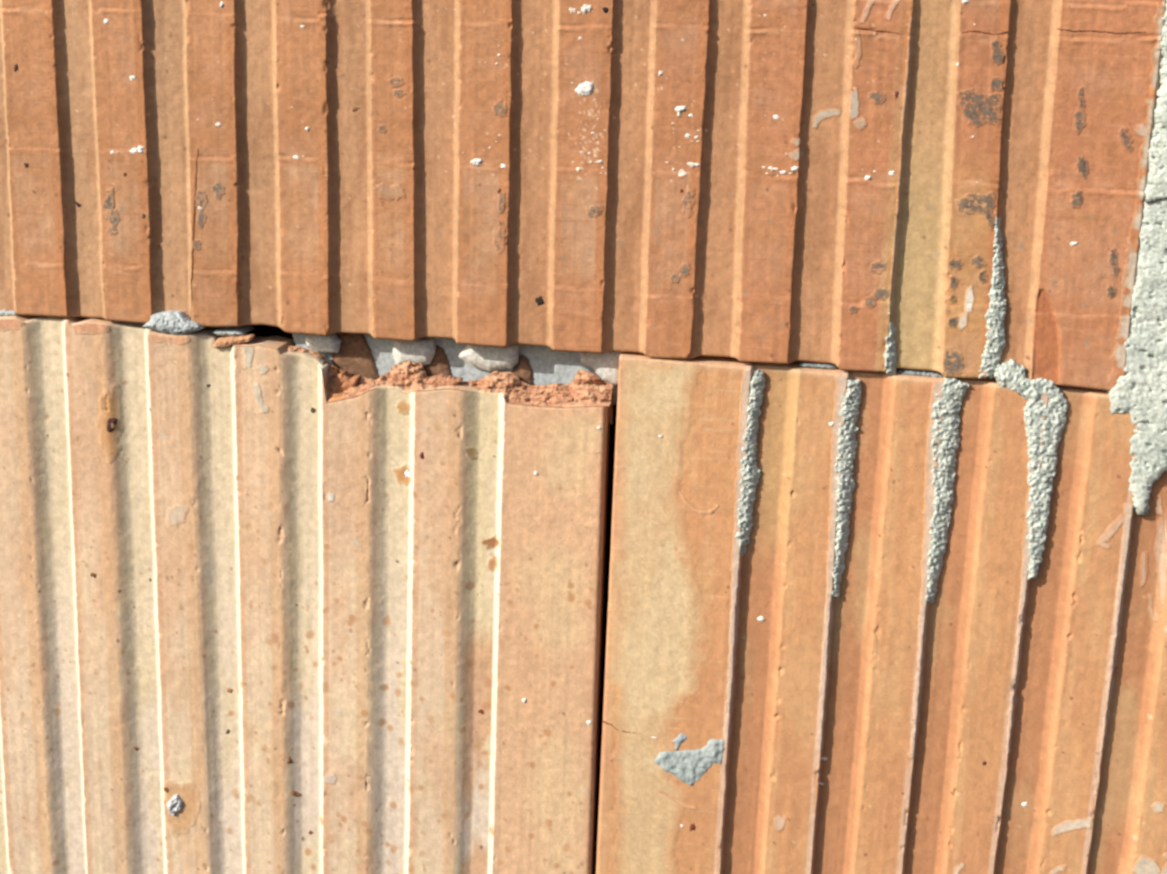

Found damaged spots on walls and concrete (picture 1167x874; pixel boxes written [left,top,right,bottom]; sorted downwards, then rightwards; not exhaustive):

spalling [212,334,613,425]